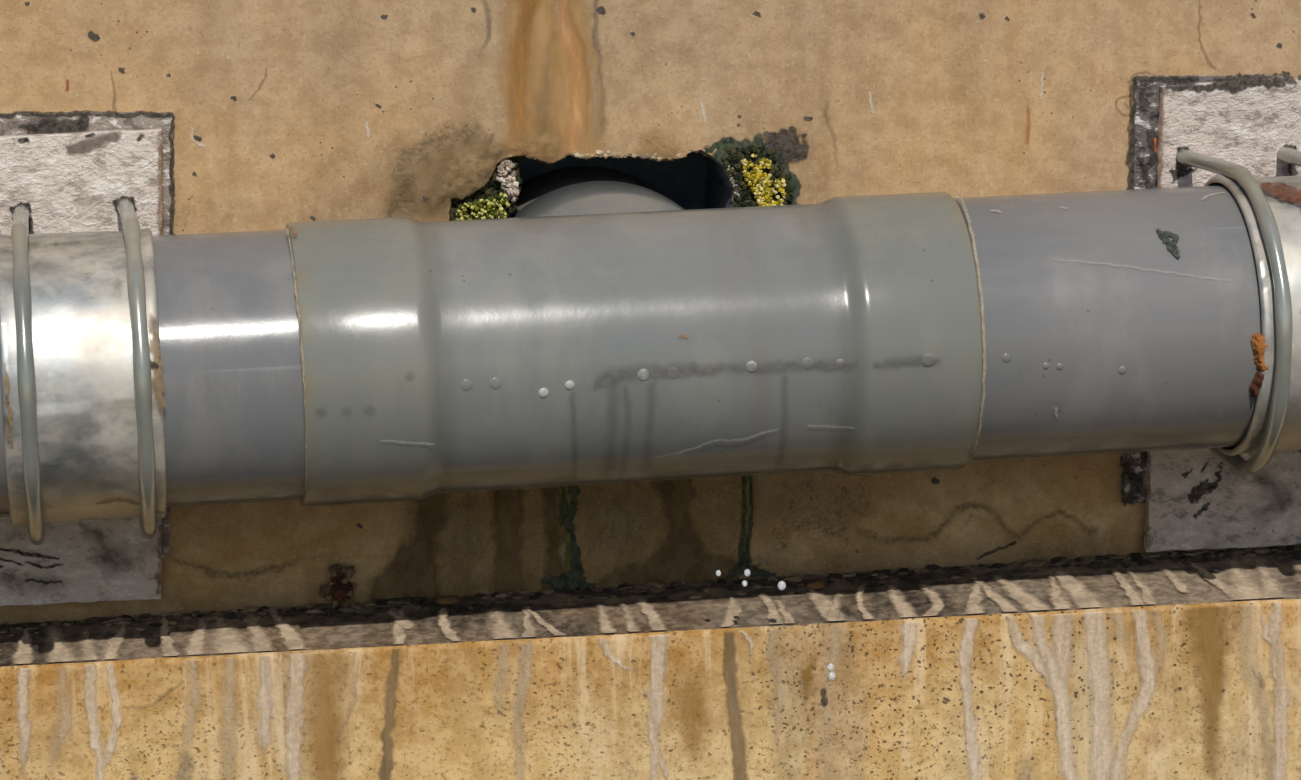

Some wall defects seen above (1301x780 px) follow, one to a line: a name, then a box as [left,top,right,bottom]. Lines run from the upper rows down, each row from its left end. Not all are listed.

spalling [496,149,551,203]
corrosion [503,0,601,160]
spalling [566,149,699,161]
leakage [13,623,127,780]
leakage [160,610,307,780]
leakage [372,493,460,780]
leakage [490,608,565,778]
leakage [543,476,754,780]
leakage [721,594,794,780]
leakage [810,585,874,662]
leakage [889,585,944,673]
leakage [959,569,1165,780]